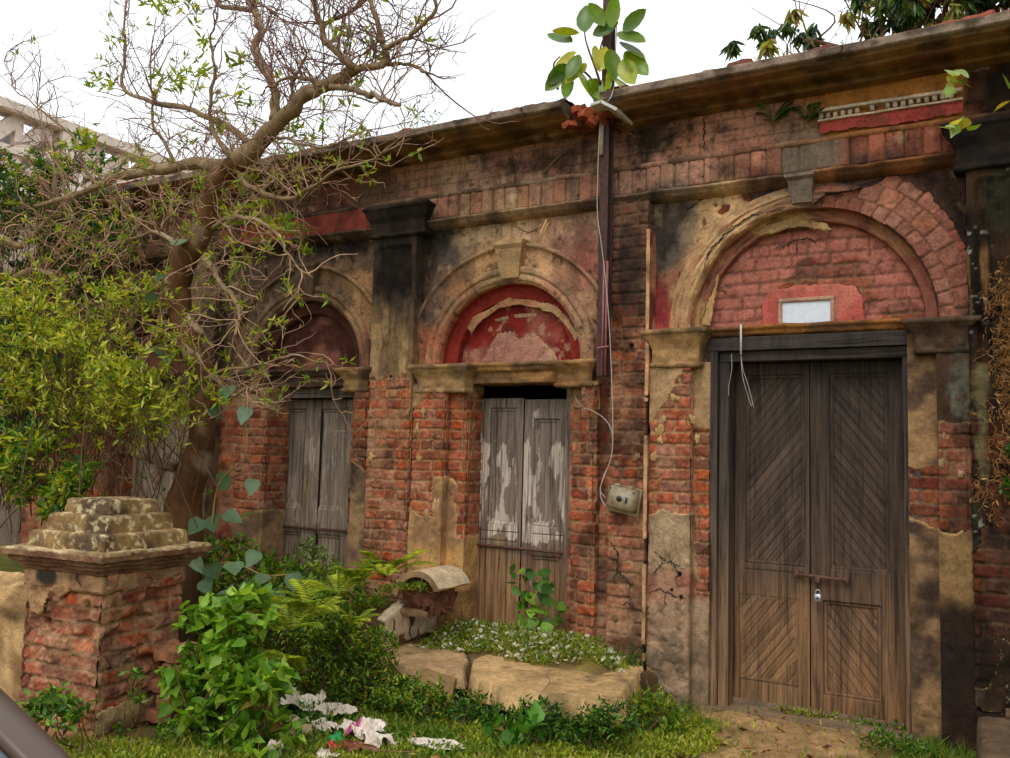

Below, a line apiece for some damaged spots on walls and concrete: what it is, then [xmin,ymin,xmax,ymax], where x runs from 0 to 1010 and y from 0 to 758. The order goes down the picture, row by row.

flaking render [352,373,483,605]
peeling [468,297,577,363]
flaking render [569,198,711,666]
flaking render [701,219,925,327]
flaking render [814,175,968,317]
flaking render [909,414,1010,689]